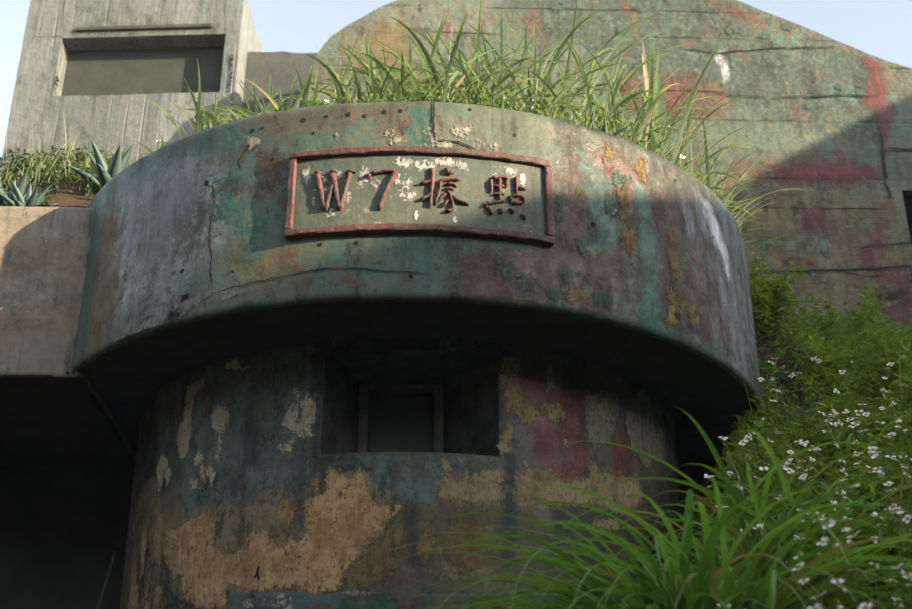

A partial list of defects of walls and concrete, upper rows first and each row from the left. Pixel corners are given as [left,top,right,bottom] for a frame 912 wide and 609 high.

crack [431,99,476,150]
crack [204,171,433,293]
peeling [176,376,232,492]
peeling [277,387,318,457]
peeling [128,454,491,609]
peeling [427,458,504,504]
peeling [495,355,566,456]
peeling [512,458,643,532]